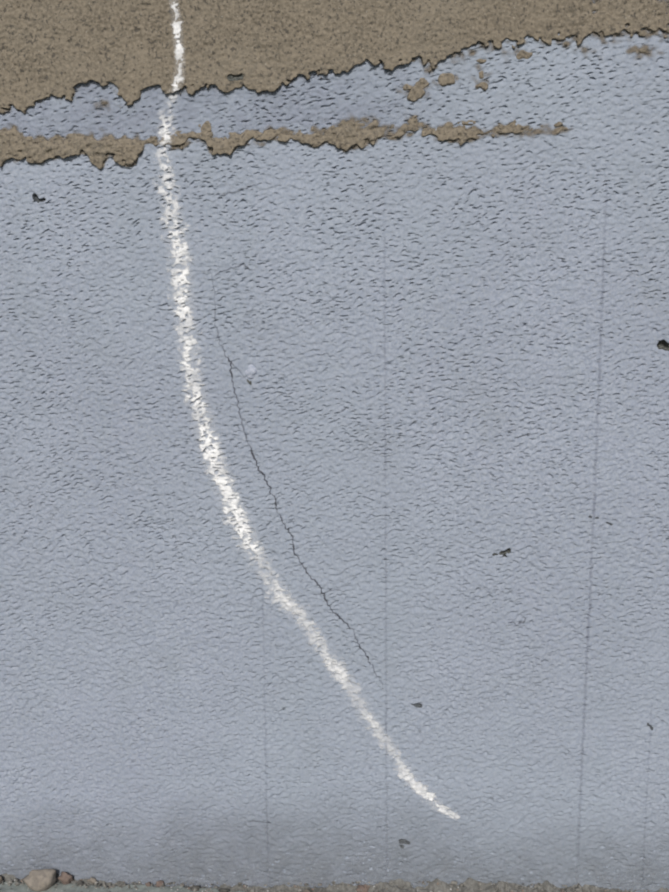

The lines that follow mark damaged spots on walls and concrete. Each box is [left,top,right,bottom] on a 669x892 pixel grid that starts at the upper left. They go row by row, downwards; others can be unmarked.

peeling [0,0,669,114]
peeling [0,115,580,169]
crack [249,445,373,665]